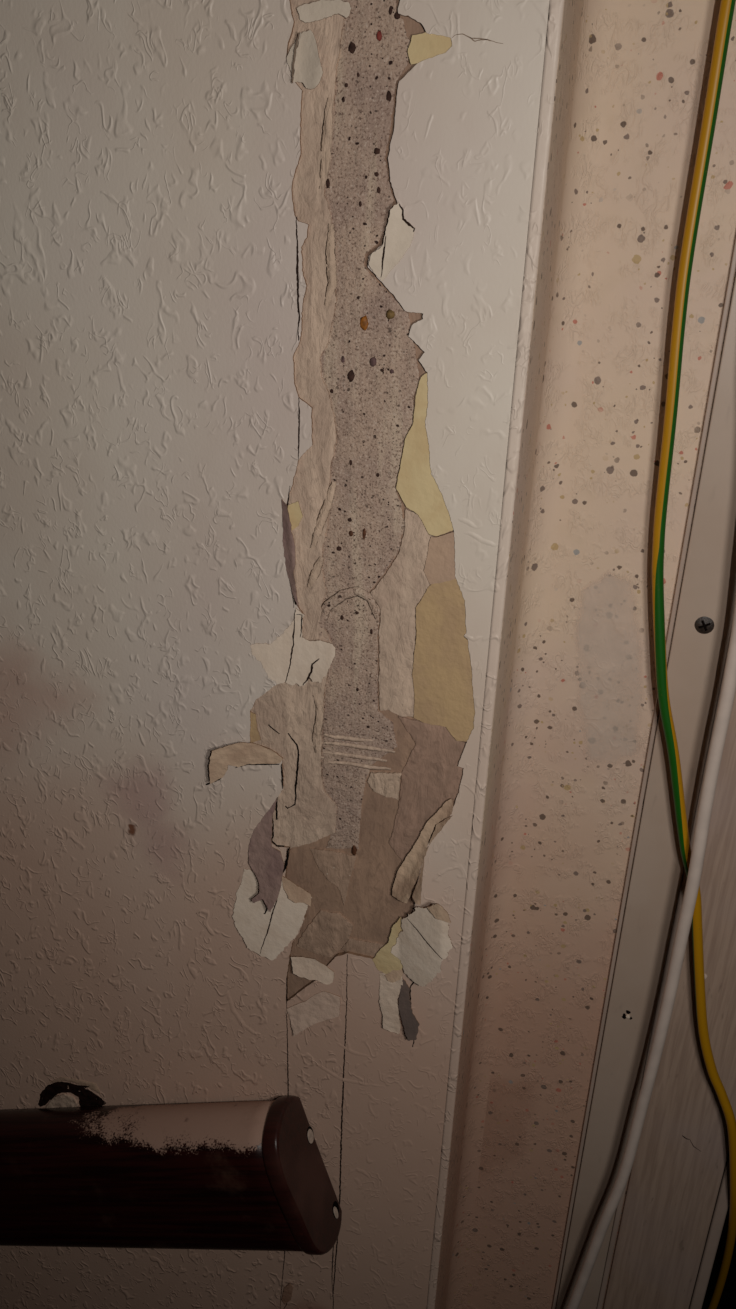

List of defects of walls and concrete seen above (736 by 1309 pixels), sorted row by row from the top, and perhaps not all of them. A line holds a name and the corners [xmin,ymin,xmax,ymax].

spalling [250,0,475,998]
crack [452,34,503,44]